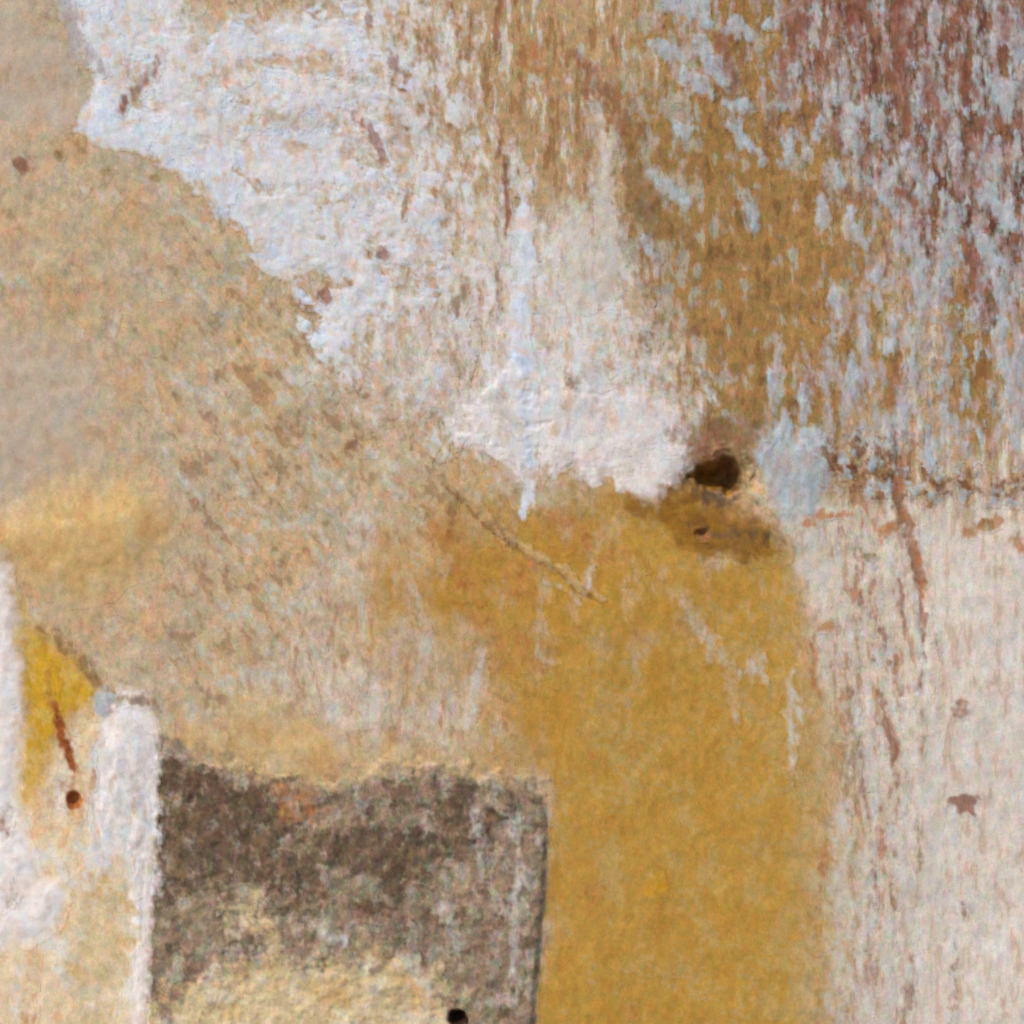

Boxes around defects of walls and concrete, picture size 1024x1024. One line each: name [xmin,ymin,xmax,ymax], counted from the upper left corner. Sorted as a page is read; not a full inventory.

peeling [53,0,724,494]
peeling [643,0,1024,668]
crack [428,473,602,615]
rust [39,658,99,825]
damp [158,755,546,1011]